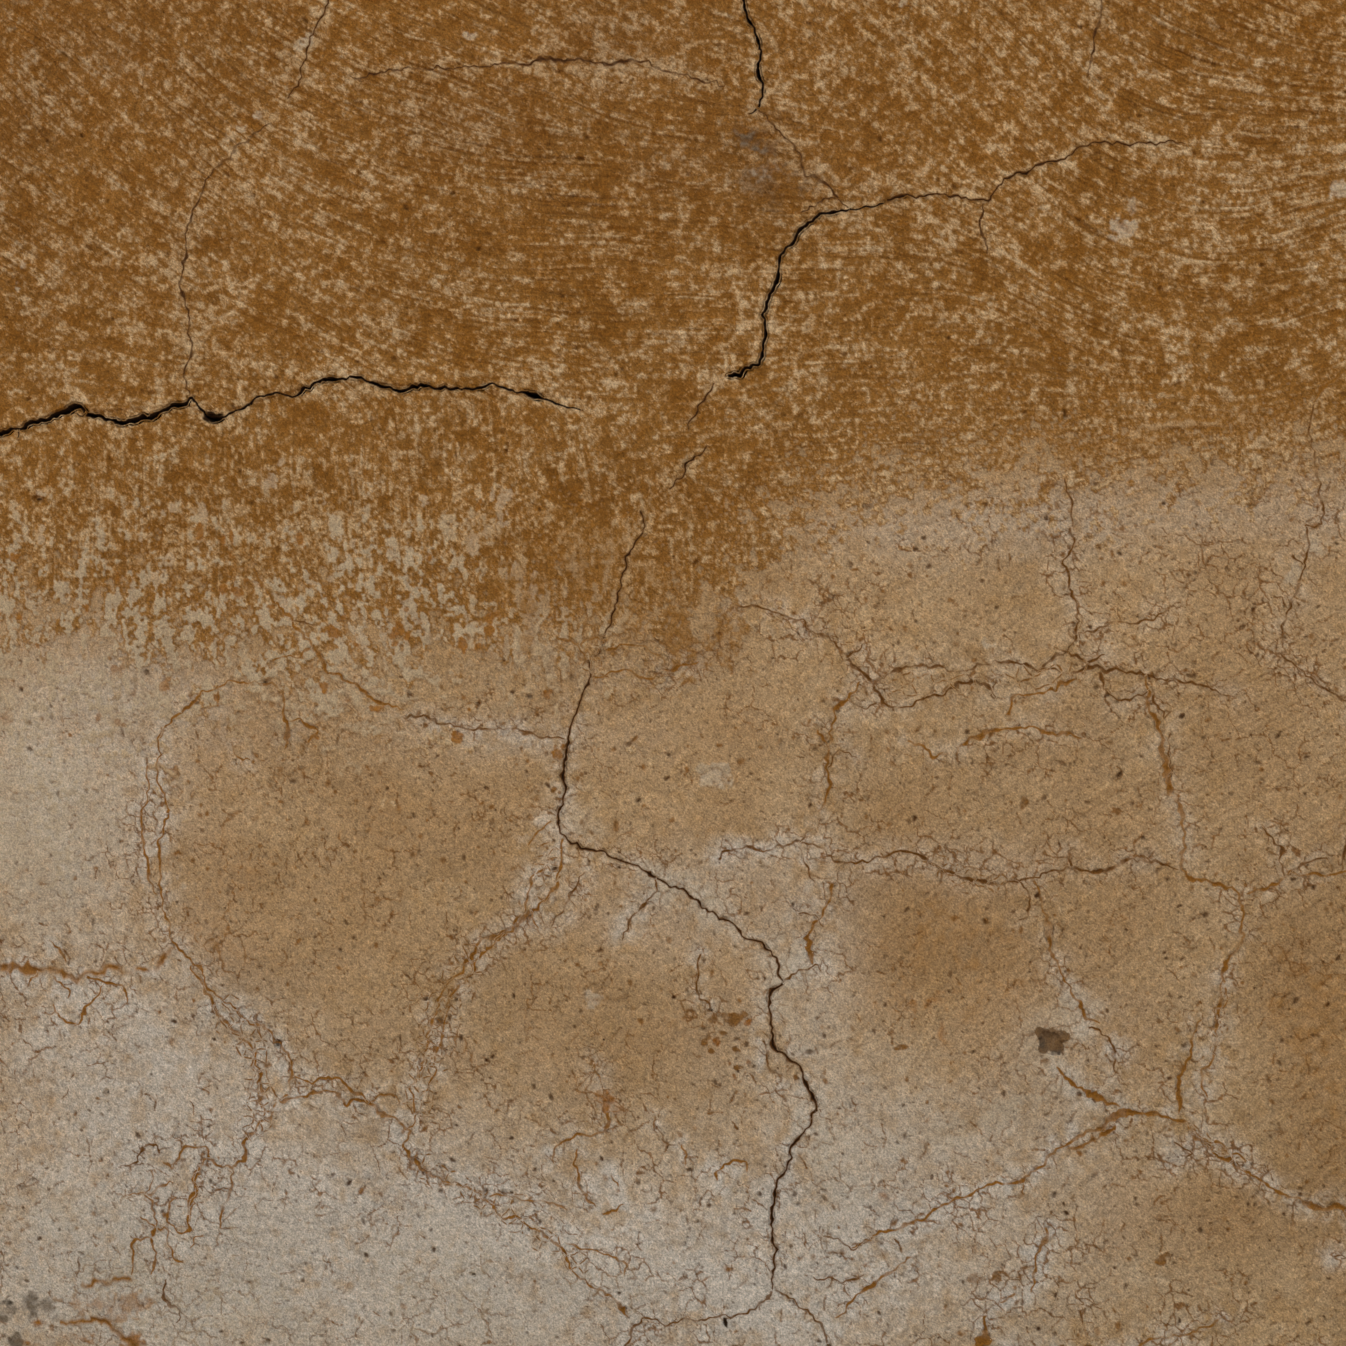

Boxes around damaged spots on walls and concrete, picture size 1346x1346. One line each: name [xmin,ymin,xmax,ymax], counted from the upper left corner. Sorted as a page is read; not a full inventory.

crack [0,0,582,439]
crack [353,55,725,88]
crack [668,0,1186,491]
crack [1272,365,1346,702]
crack [0,478,1346,1346]